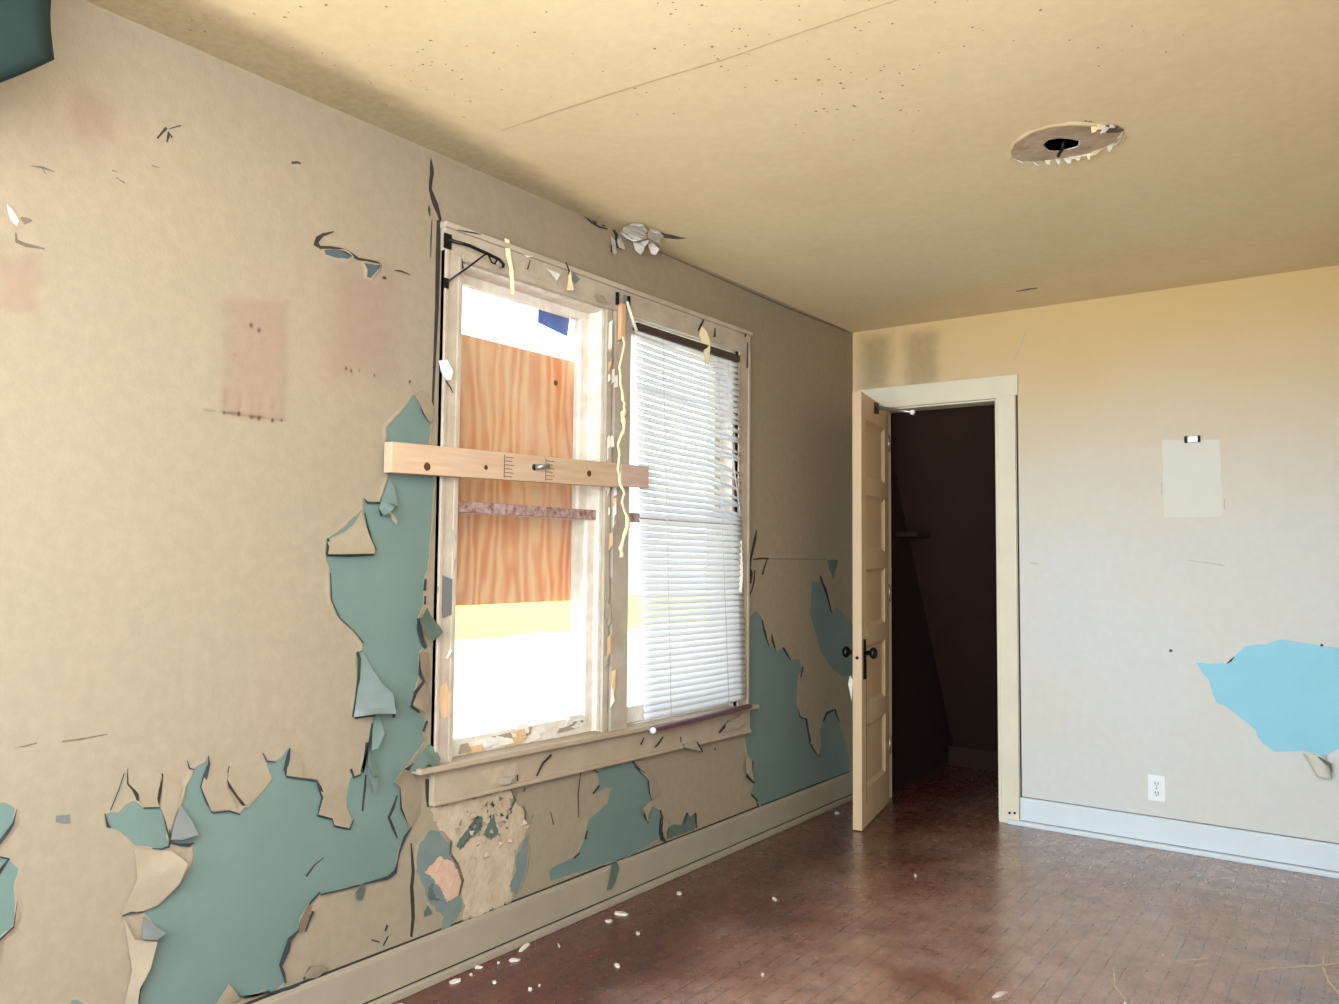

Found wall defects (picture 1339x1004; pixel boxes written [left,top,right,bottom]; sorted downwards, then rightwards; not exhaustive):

peeling [1017,123,1124,166]
peeling [313,231,410,281]
crack [428,158,442,406]
peeling [439,360,453,393]
peeling [605,320,630,557]
peeling [698,319,716,365]
peeling [99,390,534,1004]
peeling [458,714,586,755]
peeling [680,558,853,807]
peeling [1194,638,1339,778]
peeling [0,797,23,965]
peeling [547,760,697,890]